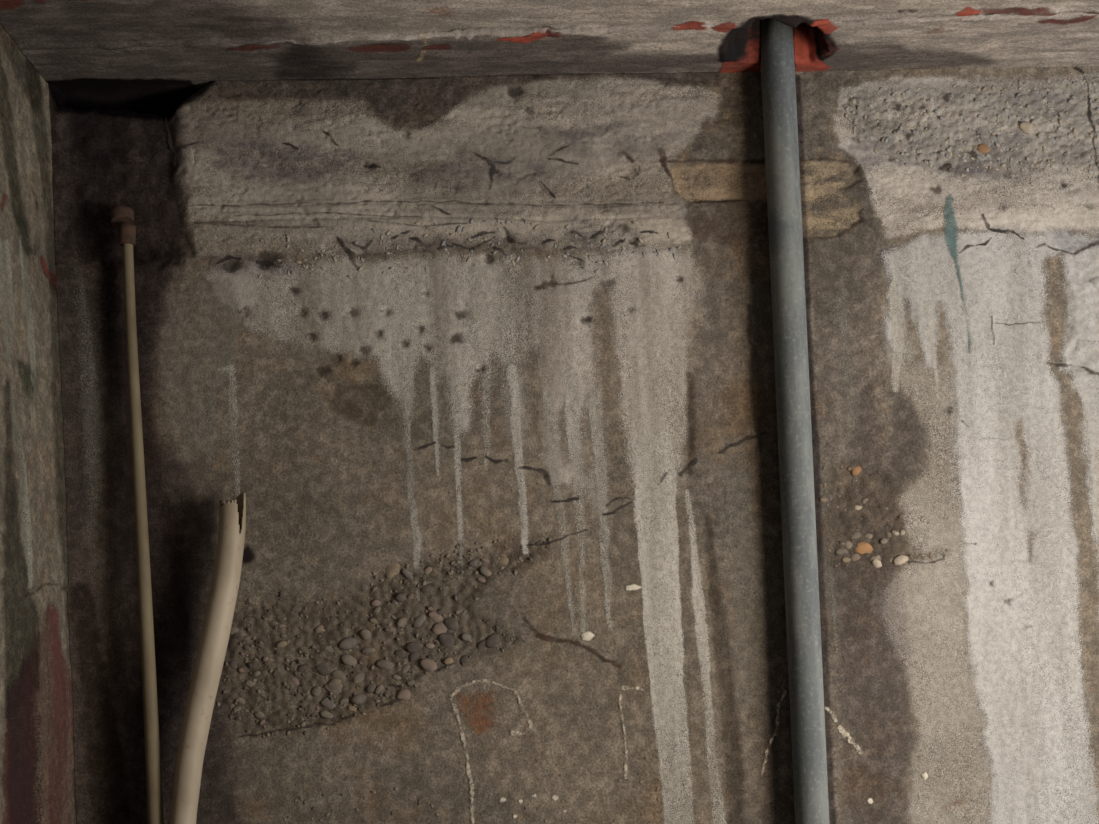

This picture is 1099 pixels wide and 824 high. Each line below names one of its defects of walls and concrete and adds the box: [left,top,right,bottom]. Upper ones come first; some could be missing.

crack [1074,68,1099,177]
crack [475,153,514,190]
crack [542,146,579,198]
crack [217,255,278,267]
crack [337,227,515,267]
crack [542,230,658,261]
crack [963,214,1099,256]
water stain [156,235,727,824]
water stain [876,197,1099,824]